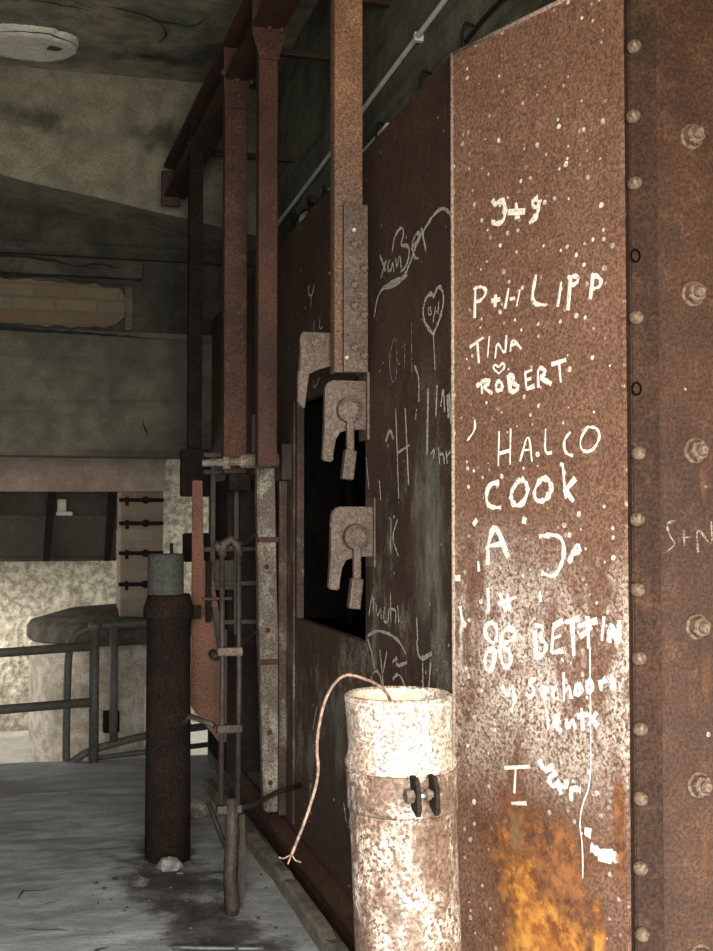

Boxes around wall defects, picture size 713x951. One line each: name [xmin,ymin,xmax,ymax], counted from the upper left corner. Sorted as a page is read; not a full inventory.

rust [477,795,605,951]
rust [614,778,625,882]